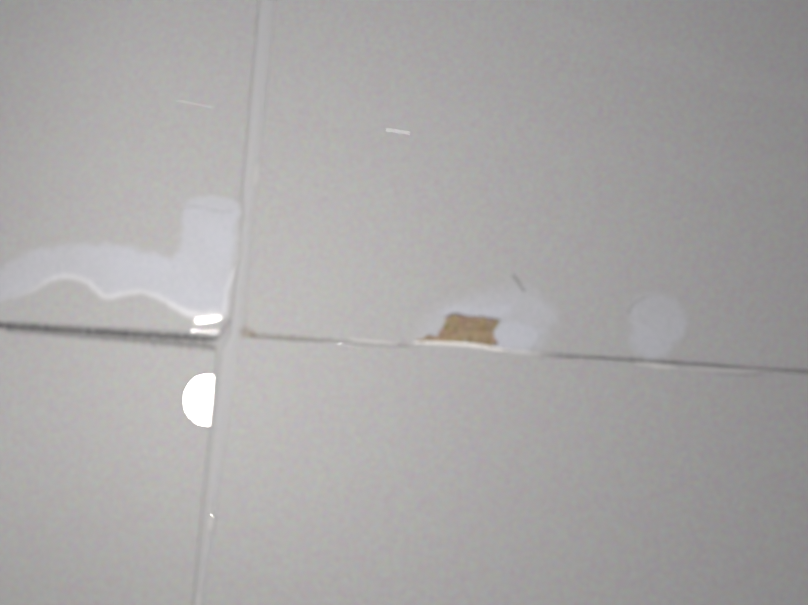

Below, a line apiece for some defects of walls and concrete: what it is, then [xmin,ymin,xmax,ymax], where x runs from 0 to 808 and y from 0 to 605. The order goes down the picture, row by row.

spalling [0,193,244,323]
spalling [405,275,584,361]